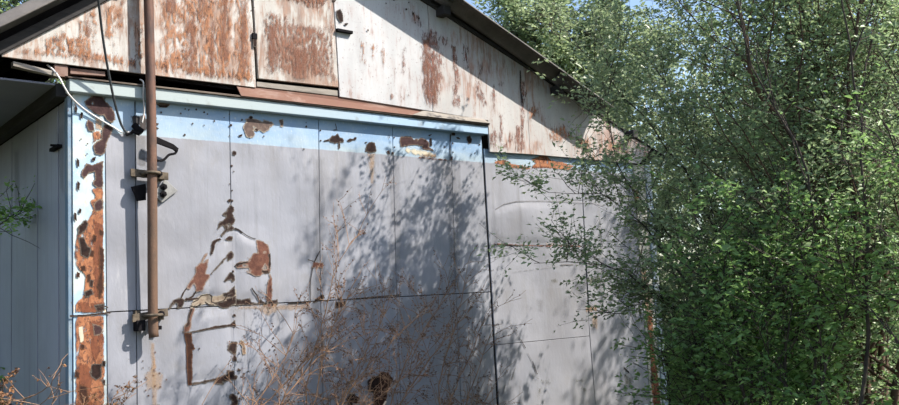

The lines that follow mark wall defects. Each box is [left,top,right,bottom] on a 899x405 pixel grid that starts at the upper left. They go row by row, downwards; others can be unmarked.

corrosion [1,0,502,112]
peeling [324,124,480,160]
corrosion [406,148,447,160]
corrosion [490,70,538,152]
corrosion [495,156,573,170]
corrosion [75,187,112,405]
peeling [169,183,325,386]